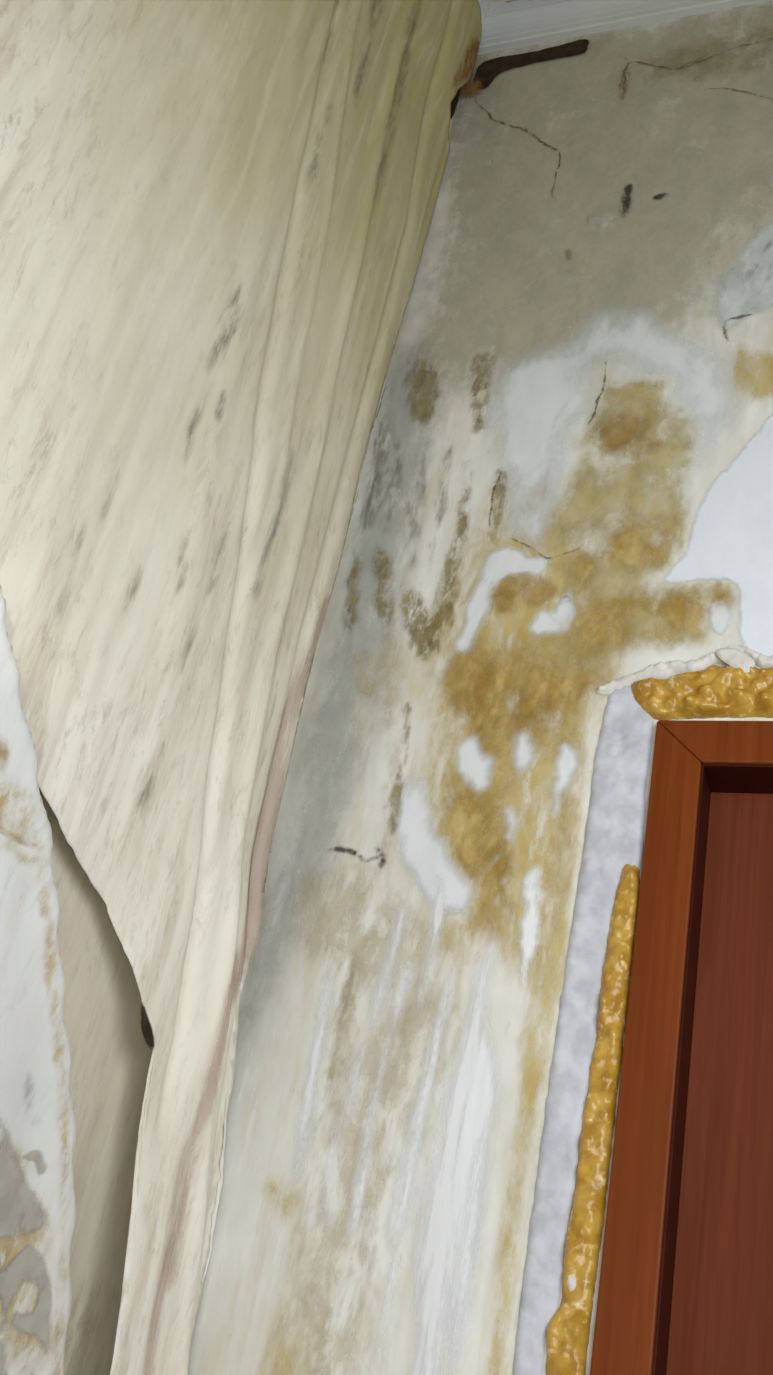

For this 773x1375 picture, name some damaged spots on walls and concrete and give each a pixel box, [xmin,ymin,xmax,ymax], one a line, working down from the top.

rust [455,40,480,98]
crack [620,42,768,98]
crack [475,97,561,193]
peeling [716,224,773,339]
water stain [192,5,773,1375]
peeling [0,1132,51,1375]
water stain [146,1177,188,1375]